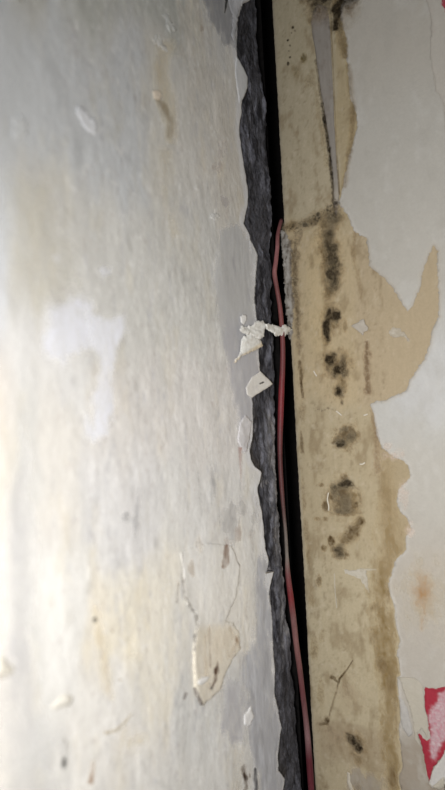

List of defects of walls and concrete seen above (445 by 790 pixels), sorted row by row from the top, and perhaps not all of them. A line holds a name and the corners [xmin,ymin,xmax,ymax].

leakage [301,0,358,58]
leakage [284,79,352,404]
spalling [180,0,316,790]
leakage [332,424,359,451]
leakage [316,475,365,559]
leakage [368,504,400,790]
leakage [346,733,363,762]